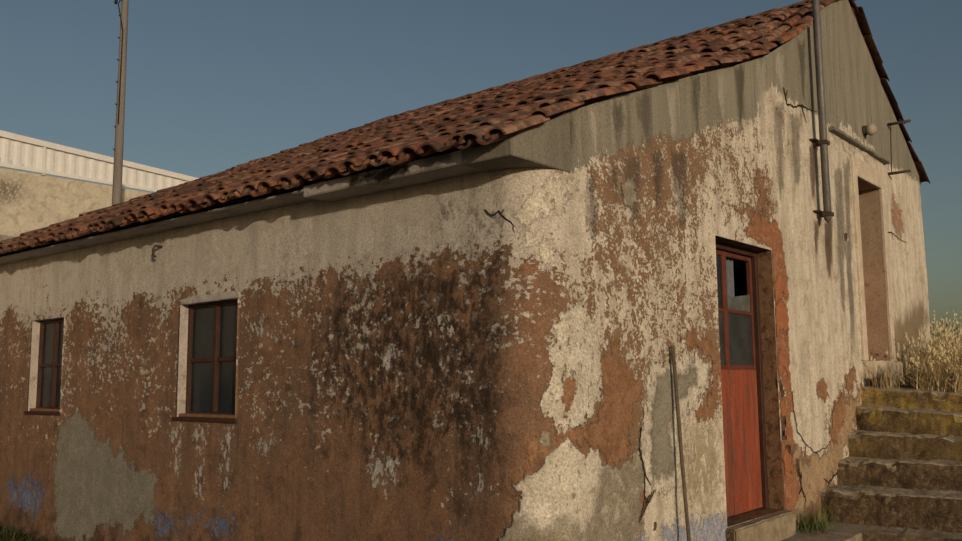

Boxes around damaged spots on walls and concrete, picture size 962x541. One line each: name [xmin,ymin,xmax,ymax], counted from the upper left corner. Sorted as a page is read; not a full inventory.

crack [783,88,817,123]
peeling [890,189,904,240]
peeling [376,344,403,374]
spalling [732,168,863,526]
peeling [7,410,237,541]
peeling [365,447,403,489]
peeling [498,302,727,541]
crack [639,427,651,518]
crack [792,391,838,503]